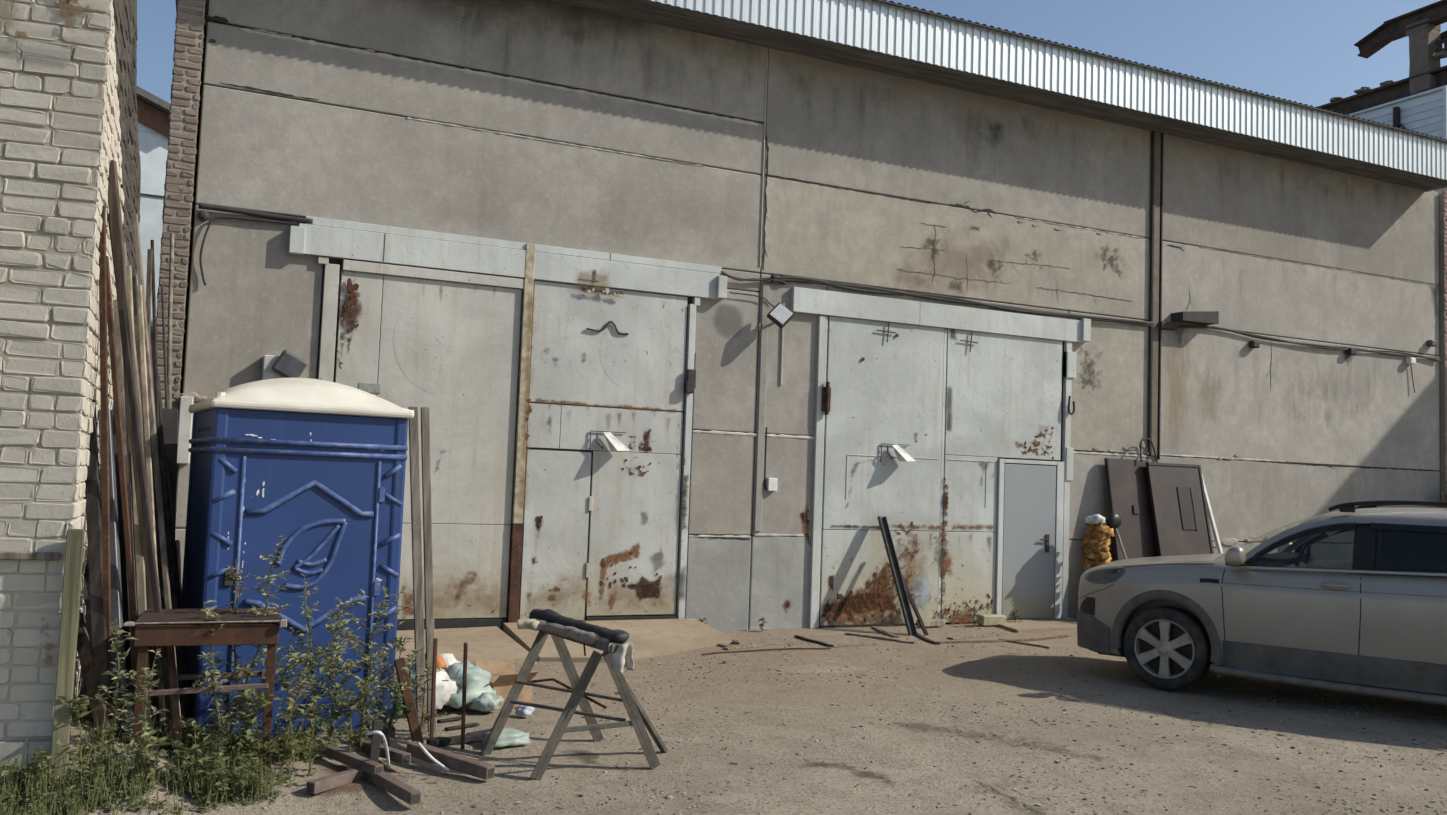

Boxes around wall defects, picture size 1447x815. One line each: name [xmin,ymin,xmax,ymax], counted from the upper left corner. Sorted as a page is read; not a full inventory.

crack [762,137,1133,303]
rust [338,269,362,369]
rust [526,348,688,555]
rust [1016,427,1054,460]
rust [585,544,662,607]
rust [821,477,994,627]